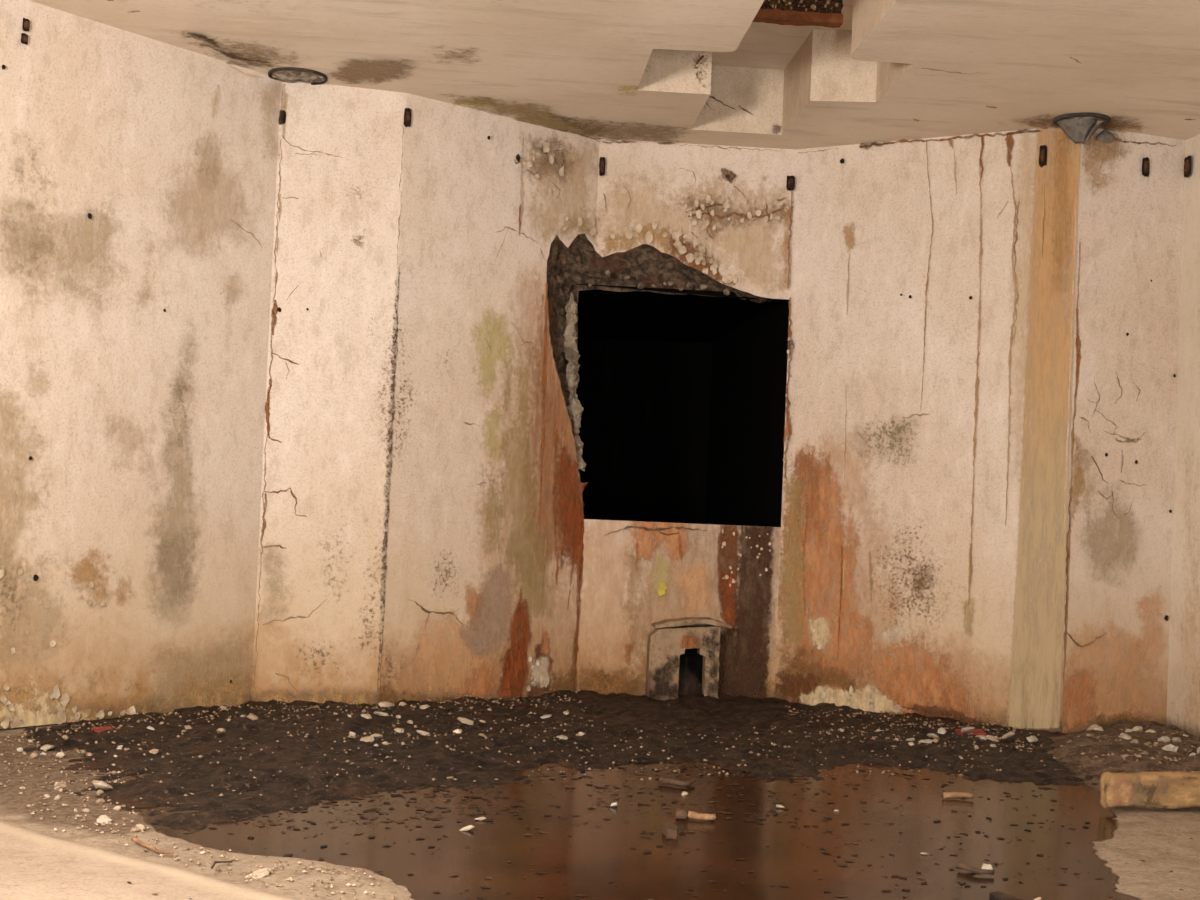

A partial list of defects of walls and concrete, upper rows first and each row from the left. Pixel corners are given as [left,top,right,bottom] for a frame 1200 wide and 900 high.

damp [186,33,296,78]
damp [332,60,411,84]
damp [1,202,111,290]
damp [152,377,196,610]
crack [230,137,337,694]
corrosion [498,282,638,698]
spalling [547,216,773,508]
spalling [783,297,793,479]
corrosion [780,447,974,719]
damp [883,527,937,622]
damp [964,279,981,630]
damp [979,115,1163,733]